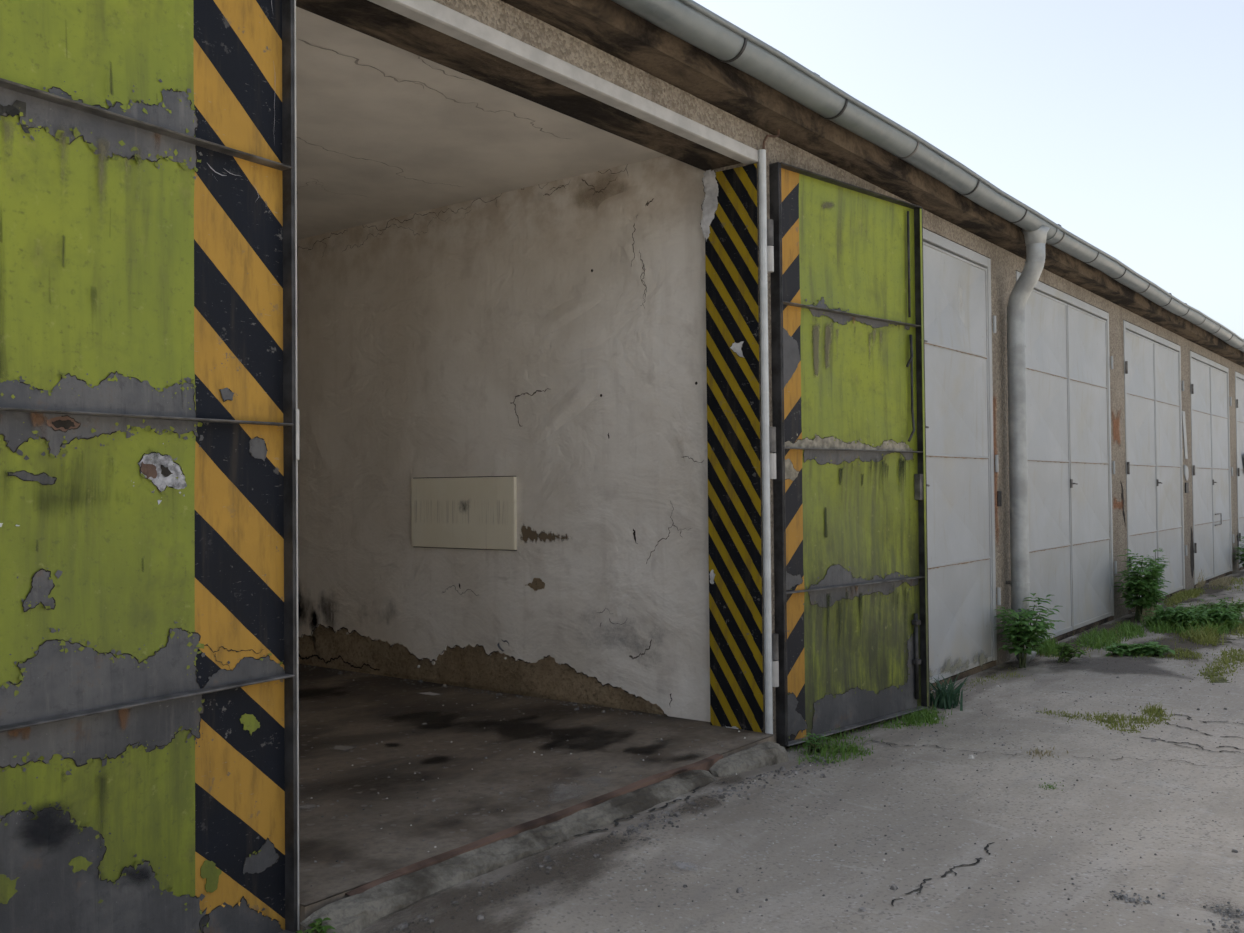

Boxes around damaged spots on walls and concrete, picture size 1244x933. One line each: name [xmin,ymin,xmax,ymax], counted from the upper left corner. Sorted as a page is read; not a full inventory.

peeling [0,79,208,180]
flaking render [700,170,719,243]
crack [631,198,654,308]
peeling [0,370,204,505]
peeling [783,434,914,481]
rust [1112,414,1120,442]
crack [646,501,691,564]
peeling [17,568,63,612]
flaking render [0,621,666,778]
crack [1074,714,1244,767]
peeling [0,802,283,933]
crack [891,842,994,906]